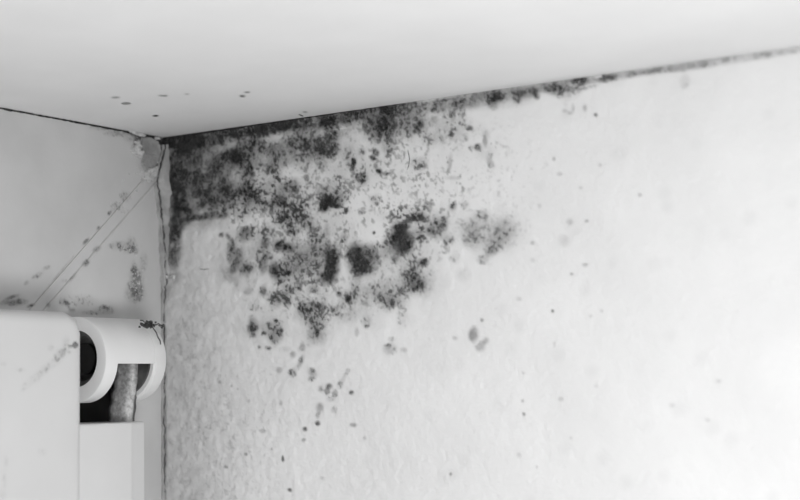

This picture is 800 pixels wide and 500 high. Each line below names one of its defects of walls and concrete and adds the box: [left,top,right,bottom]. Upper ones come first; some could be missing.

leakage [131,102,417,256]
leakage [392,215,422,254]
leakage [321,246,372,283]